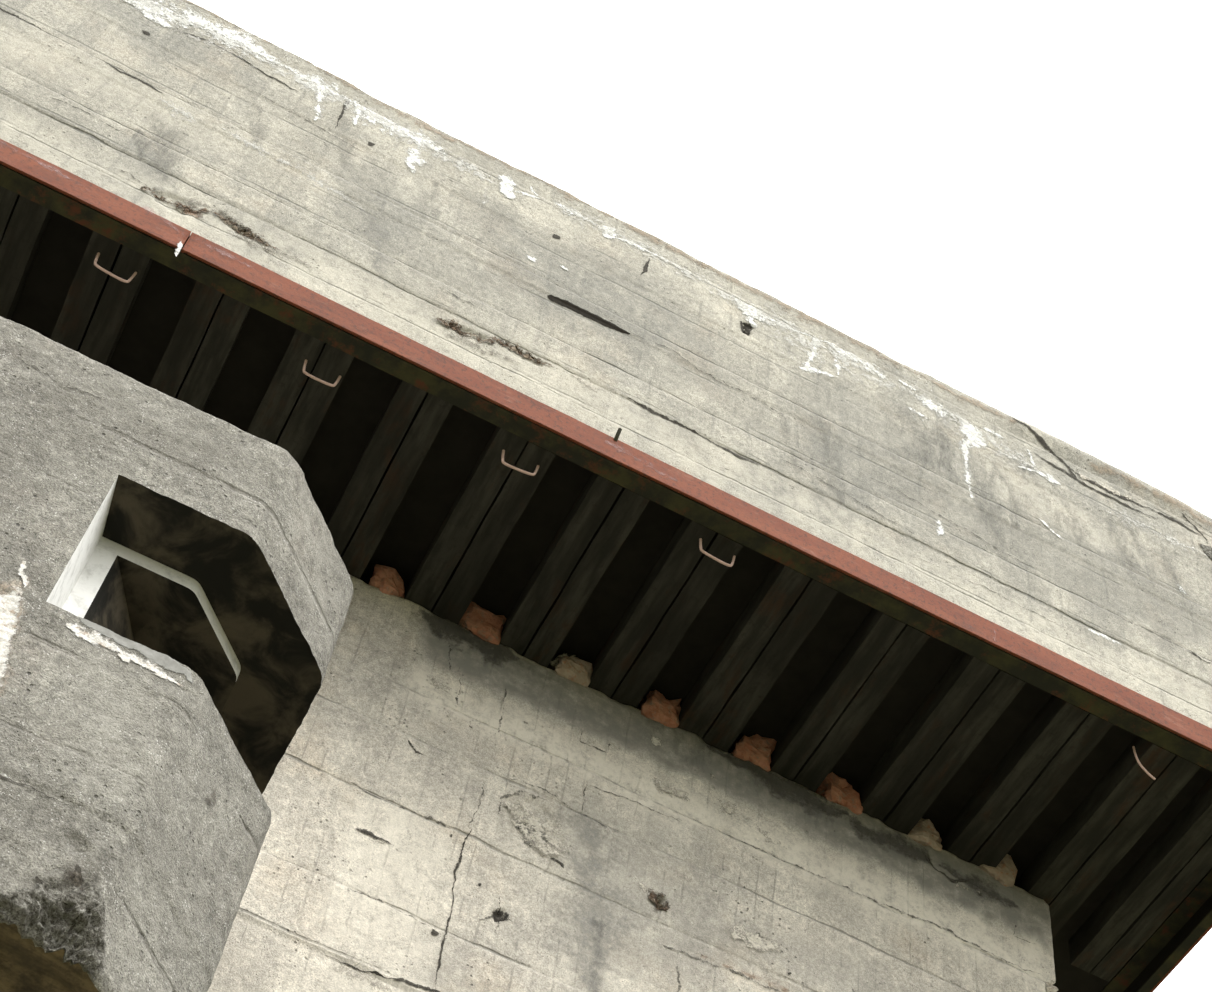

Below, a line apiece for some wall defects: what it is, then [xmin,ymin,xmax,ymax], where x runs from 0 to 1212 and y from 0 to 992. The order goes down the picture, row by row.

spalling [141,186,312,268]
spalling [437,318,557,369]
spalling [548,295,630,334]
crack [1013,418,1210,536]
crack [0,774,63,803]
spalling [0,864,106,980]
crack [325,782,484,992]